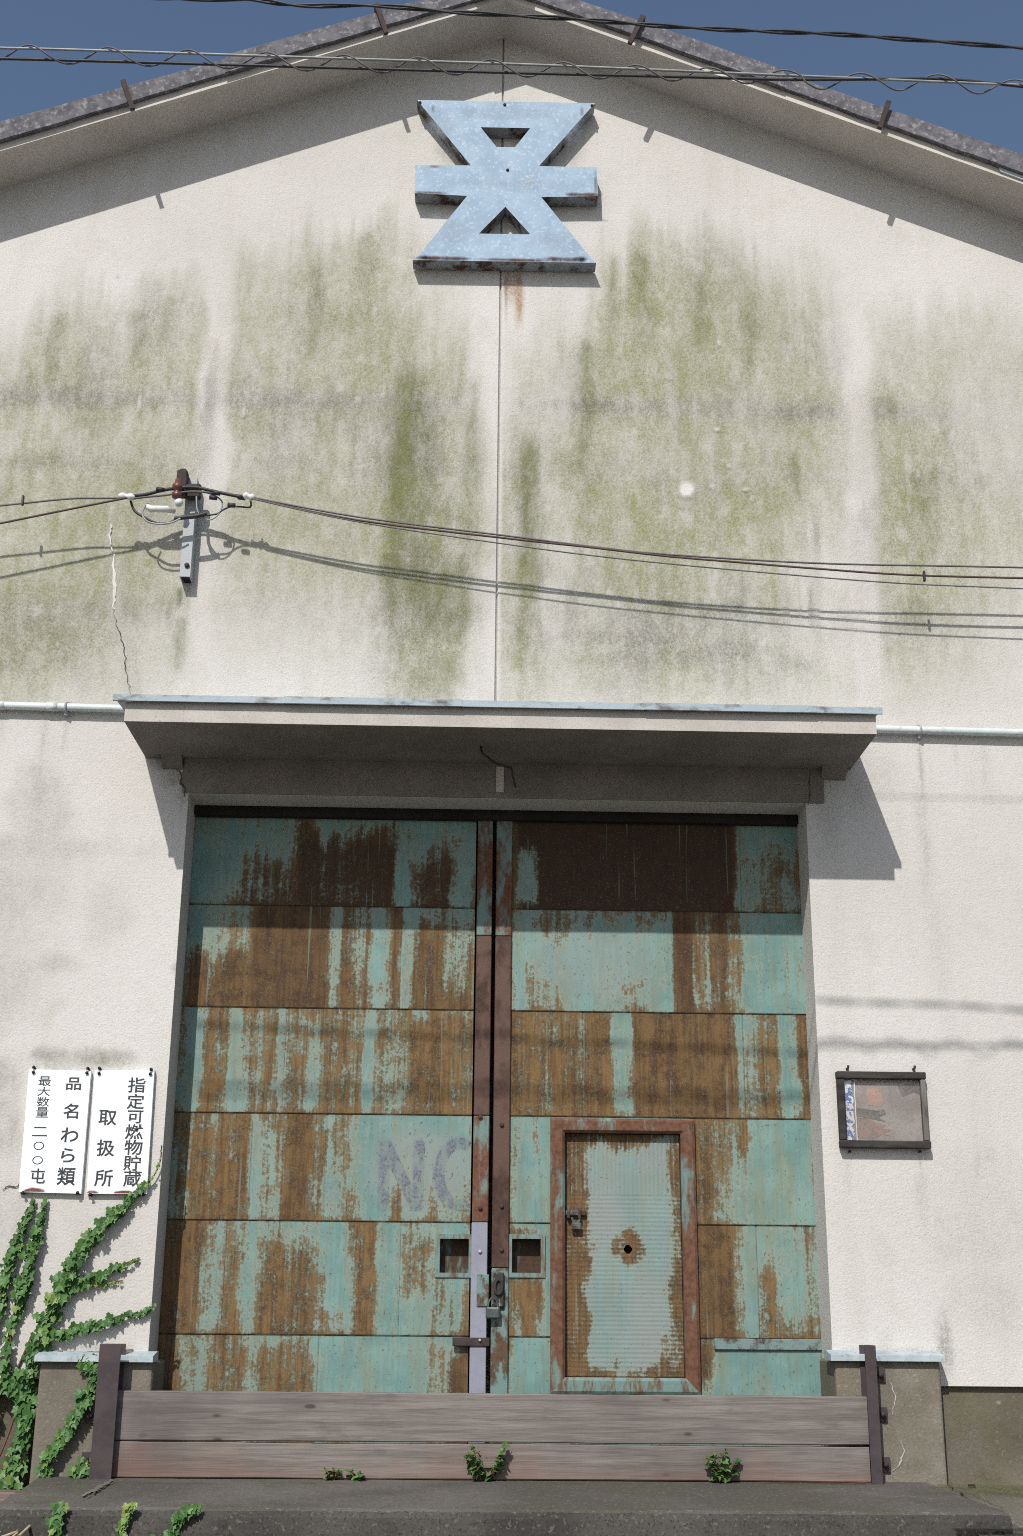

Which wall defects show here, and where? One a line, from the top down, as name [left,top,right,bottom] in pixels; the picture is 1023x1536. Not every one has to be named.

corrosion [493,257,586,310]
crack [108,523,130,690]